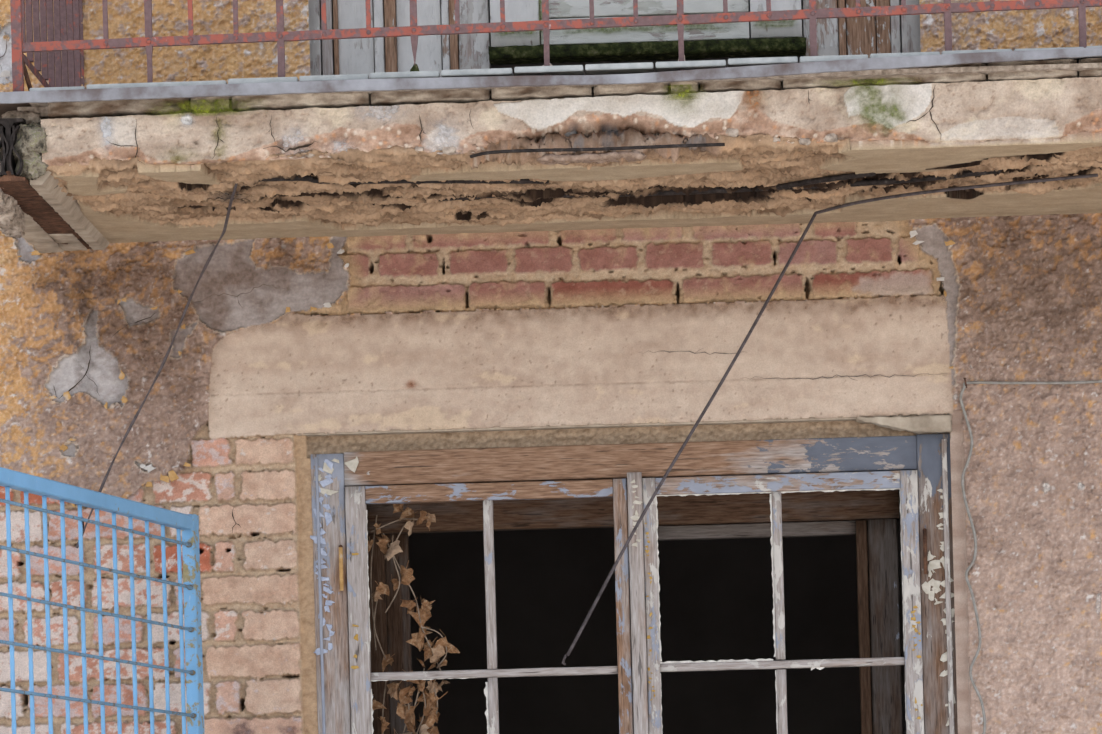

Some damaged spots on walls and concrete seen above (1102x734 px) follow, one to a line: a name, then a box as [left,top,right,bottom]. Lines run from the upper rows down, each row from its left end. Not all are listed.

peeling [0,17,12,85]
spalling [42,83,1102,386]
peeling [44,309,129,409]
peeling [921,512,955,634]
peeling [911,606,921,658]